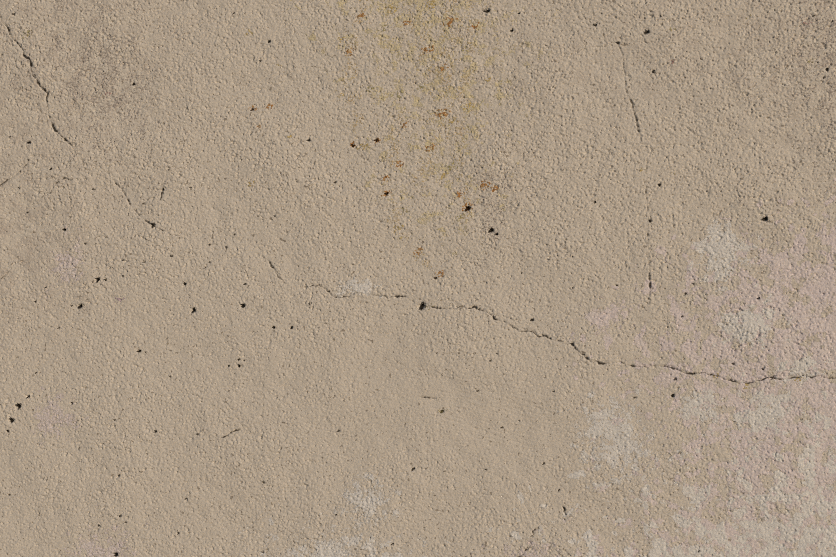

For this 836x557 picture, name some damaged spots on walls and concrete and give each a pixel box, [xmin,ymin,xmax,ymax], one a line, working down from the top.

crack [0,16,72,146]